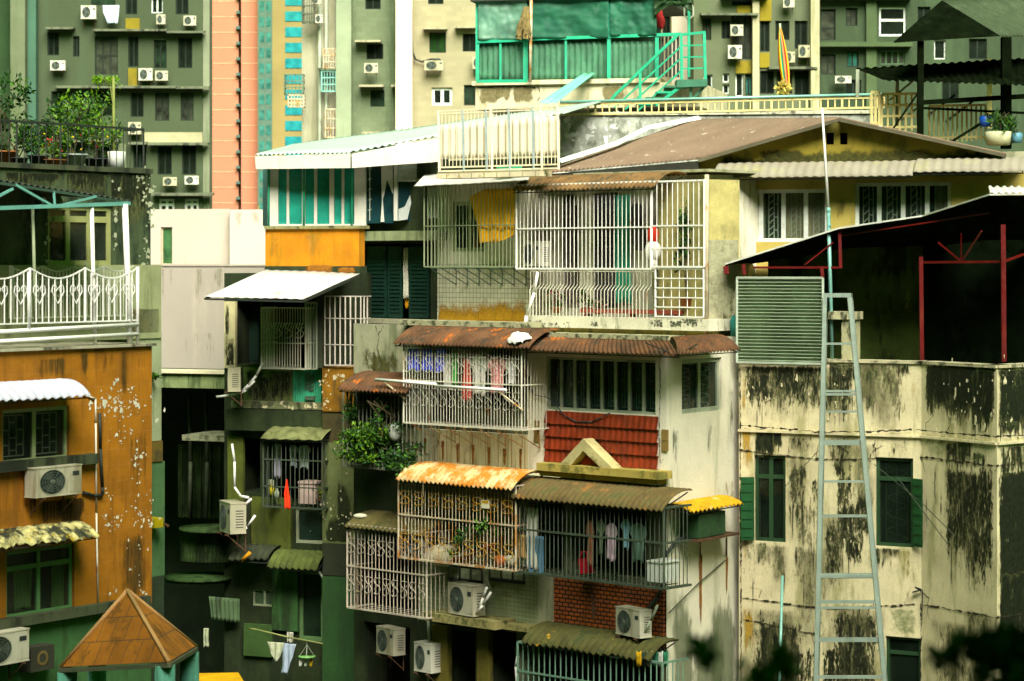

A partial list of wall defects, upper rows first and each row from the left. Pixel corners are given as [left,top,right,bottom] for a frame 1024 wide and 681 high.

spalling [136,166,157,265]
peeling [88,378,166,551]
water stain [747,429,871,606]
mould [745,364,910,421]
water stain [925,365,1024,631]
water stain [750,609,881,681]